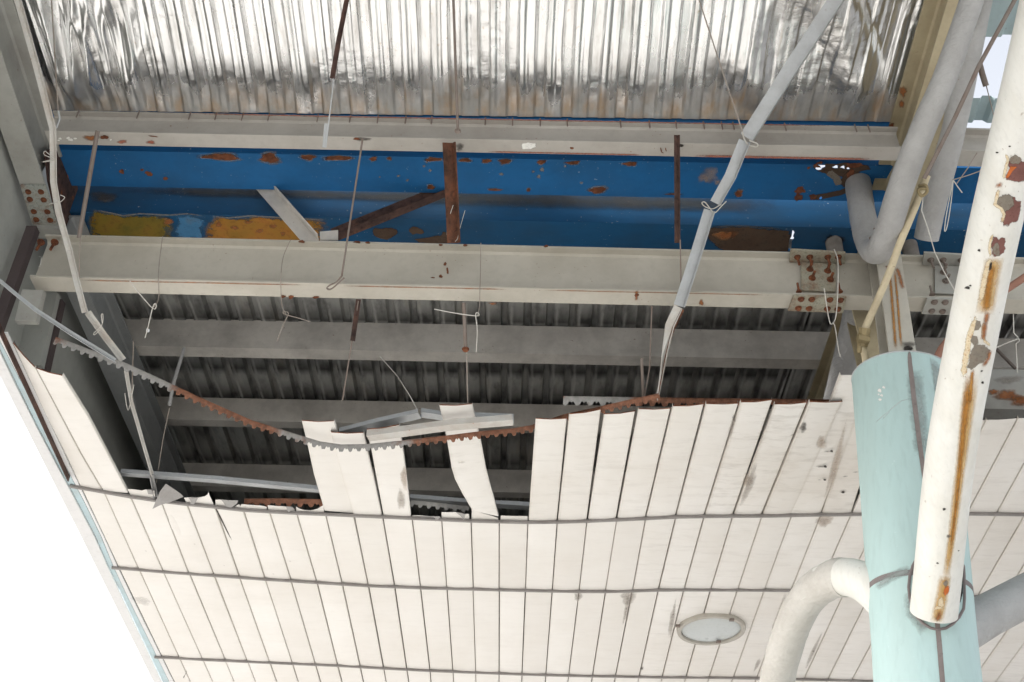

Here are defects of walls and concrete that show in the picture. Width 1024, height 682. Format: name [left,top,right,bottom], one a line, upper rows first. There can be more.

corrosion [201,153,238,161]
corrosion [260,152,279,164]
corrosion [458,145,636,166]
corrosion [706,155,864,179]
peeling [977,146,1024,257]
corrosion [708,225,792,252]
peeling [961,313,991,384]
corrosion [934,372,974,621]